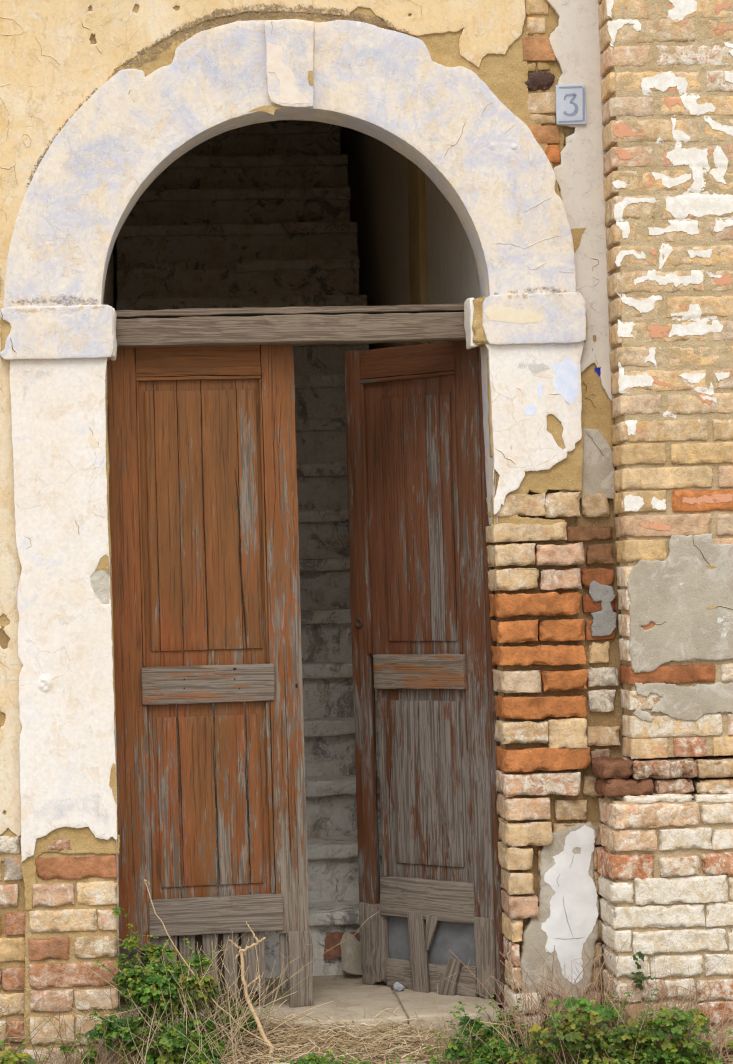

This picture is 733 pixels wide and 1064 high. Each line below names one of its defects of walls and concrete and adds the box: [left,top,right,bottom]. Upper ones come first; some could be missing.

peeling [606,0,641,46]
peeling [667,0,698,33]
peeling [708,2,733,56]
flaking render [107,0,564,200]
flaking render [484,71,733,1028]
flaking render [90,552,110,604]
flaking render [0,614,10,649]
flaking render [109,763,117,805]
flaking render [0,827,120,1064]